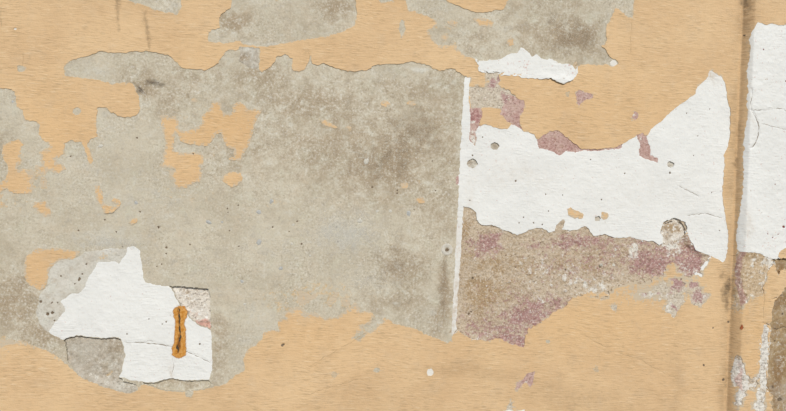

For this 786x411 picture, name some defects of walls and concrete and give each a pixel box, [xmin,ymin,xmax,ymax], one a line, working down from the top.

corrosion [172,306,188,358]
peeling [0,47,466,397]
peeling [208,0,357,47]
peeling [406,0,730,347]
spalling [722,287,786,411]
peeling [734,22,786,311]